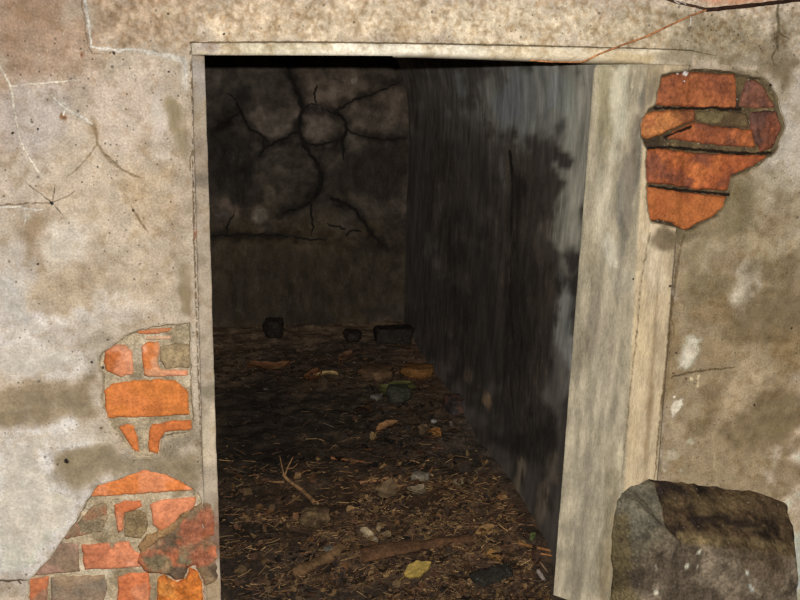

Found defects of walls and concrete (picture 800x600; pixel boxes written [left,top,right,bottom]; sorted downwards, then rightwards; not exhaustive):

crack [771,5,789,66]
crack [0,66,136,223]
spalling [638,67,786,232]
crack [189,41,716,456]
water stain [0,376,96,428]
spalling [25,321,220,600]